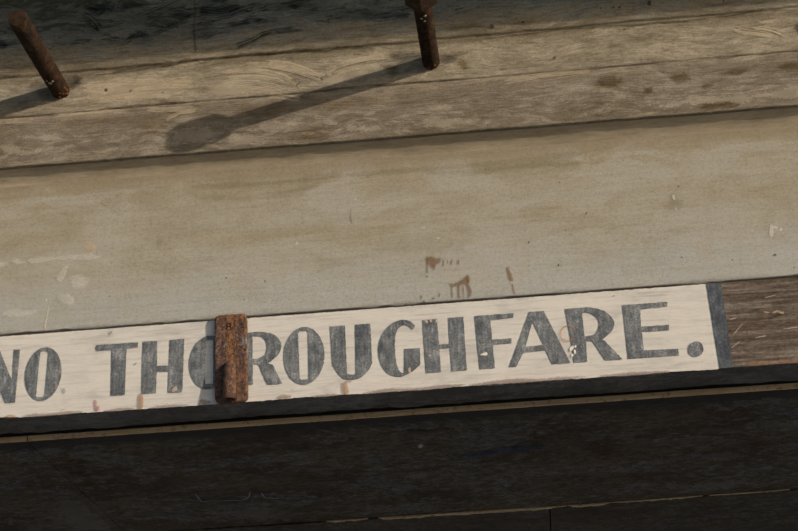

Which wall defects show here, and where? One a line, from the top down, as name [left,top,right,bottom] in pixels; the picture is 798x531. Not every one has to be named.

corrosion [426,257,459,277]
corrosion [450,276,472,298]